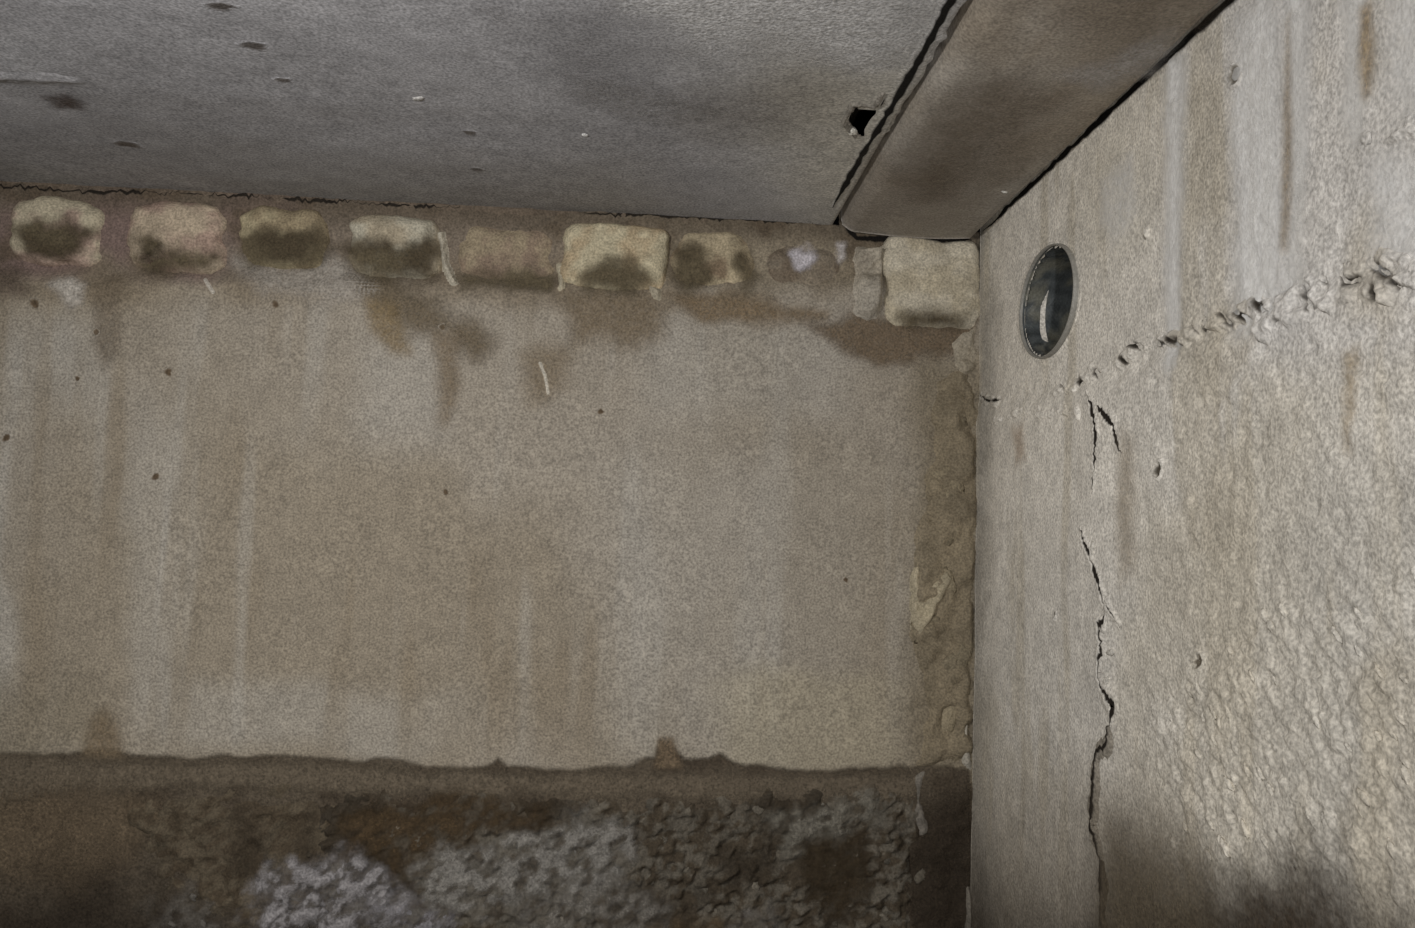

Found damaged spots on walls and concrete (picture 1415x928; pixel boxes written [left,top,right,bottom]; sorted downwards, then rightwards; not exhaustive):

leakage [53,278,82,306]
leakage [683,296,973,364]
crack [1085,390,1123,494]
crack [1079,527,1121,928]
leakage [0,718,989,928]
leakage [1108,838,1360,928]